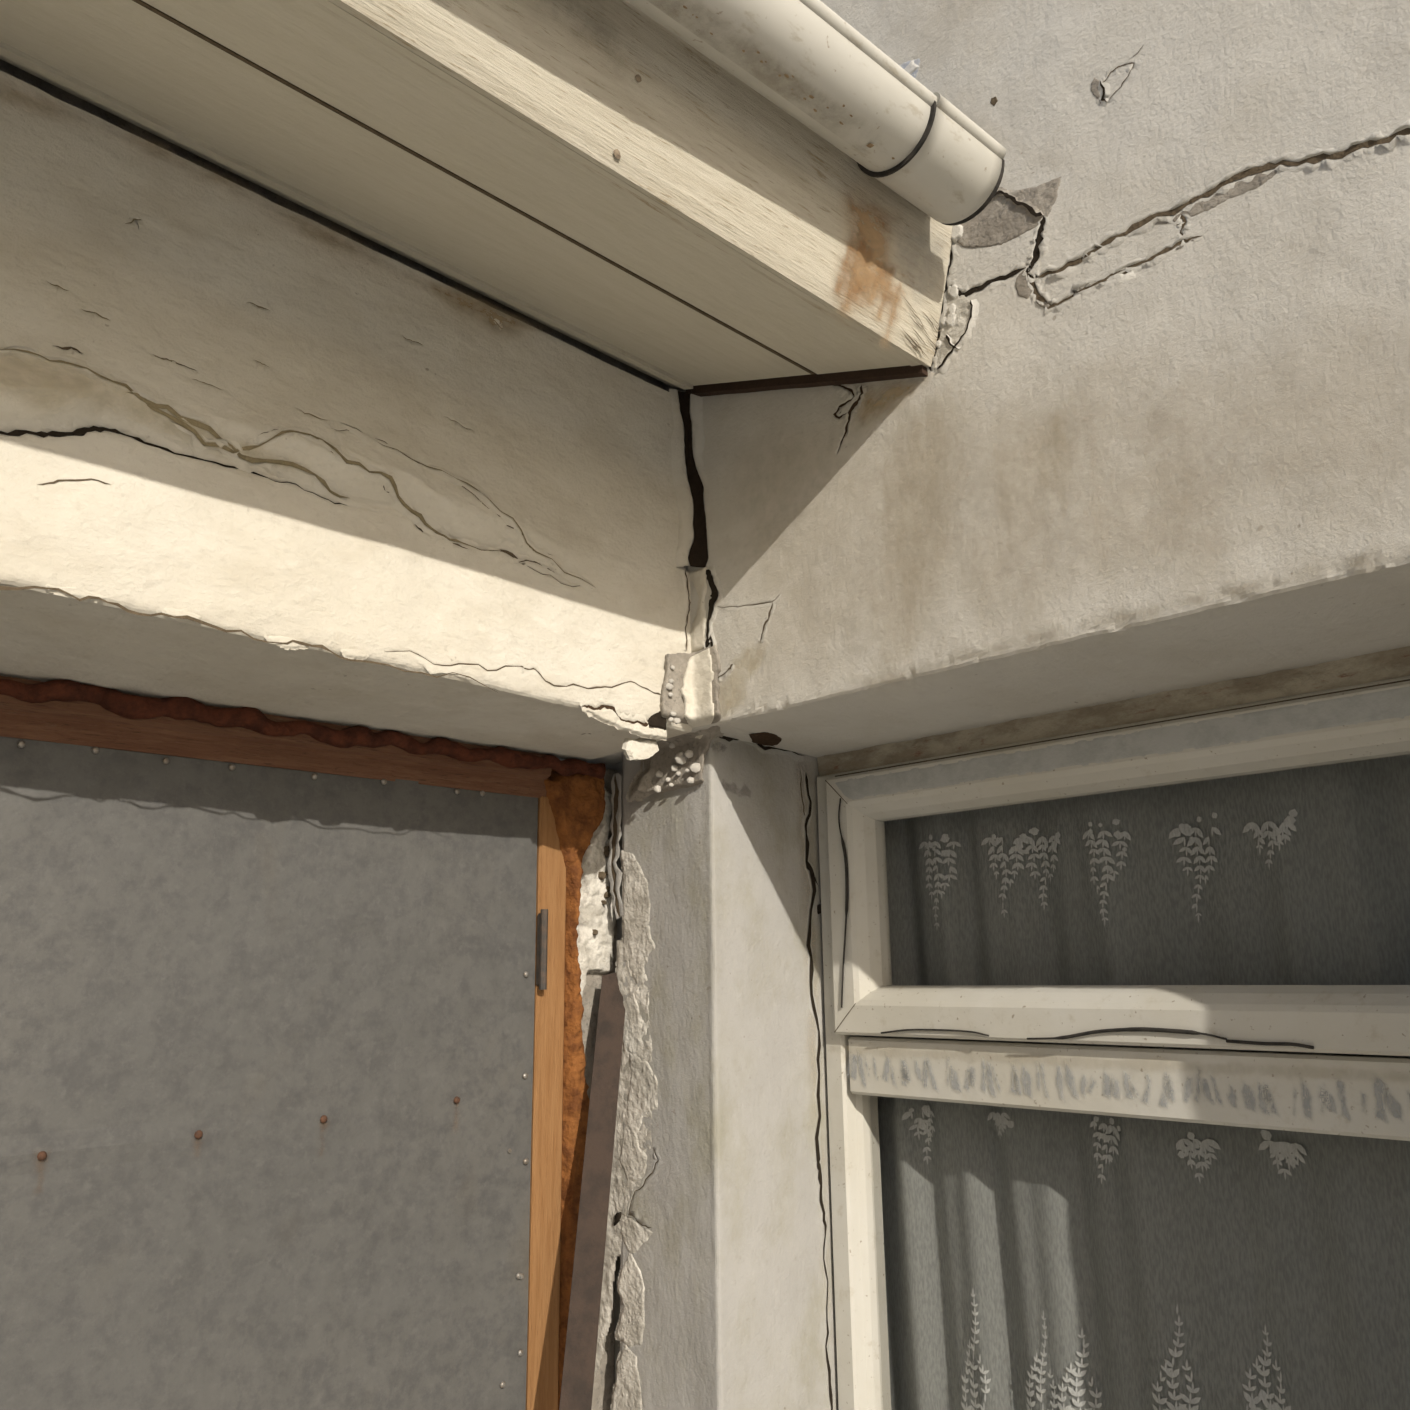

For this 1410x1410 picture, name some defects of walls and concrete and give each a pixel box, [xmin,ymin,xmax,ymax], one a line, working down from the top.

peeling [899,59,920,78]
corrosion [837,202,894,317]
spalling [951,177,1061,248]
crack [927,119,1410,373]
crack [669,389,782,683]
crack [830,384,869,455]
spalling [575,567,724,1410]
crack [711,732,833,1410]